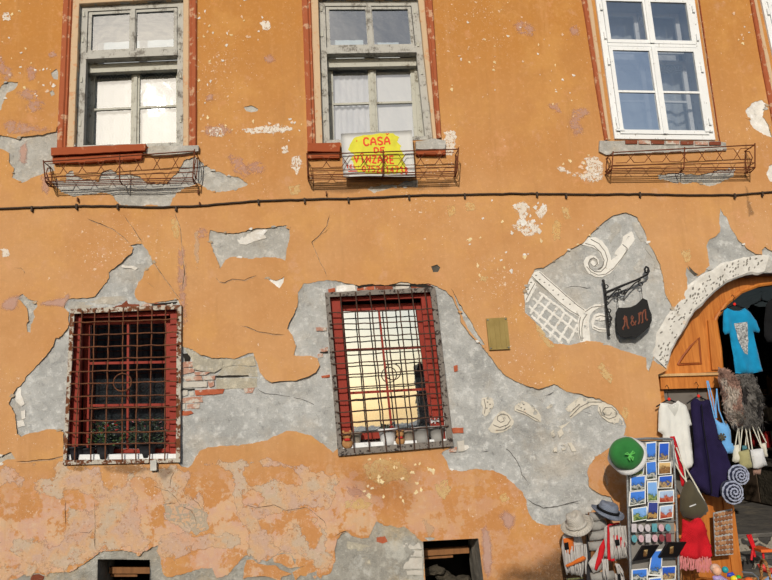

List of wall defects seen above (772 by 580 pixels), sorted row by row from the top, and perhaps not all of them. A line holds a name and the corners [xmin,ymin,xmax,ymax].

flaking render [0,121,263,206]
crack [151,214,185,299]
peeling [200,105,302,195]
flaking render [368,180,418,193]
peeling [444,130,457,157]
peeling [501,201,569,243]
peeling [557,155,605,182]
flaking render [523,212,681,371]
flaking render [682,208,772,285]
flaking render [746,100,772,137]
flaking render [0,219,627,580]